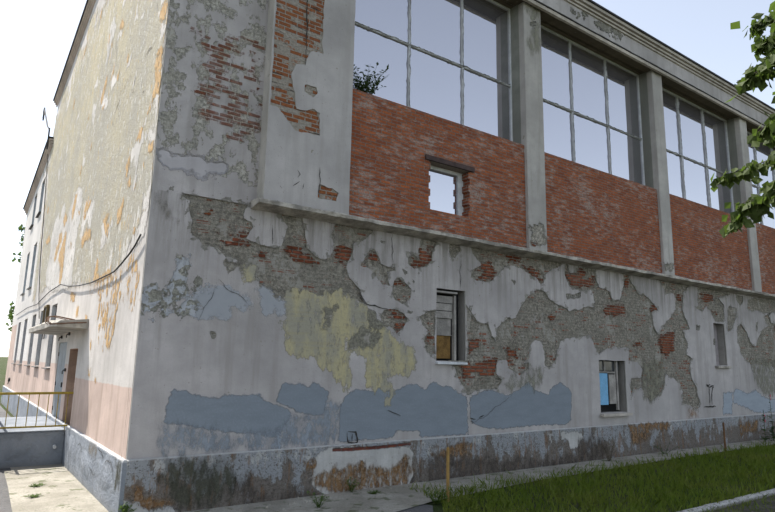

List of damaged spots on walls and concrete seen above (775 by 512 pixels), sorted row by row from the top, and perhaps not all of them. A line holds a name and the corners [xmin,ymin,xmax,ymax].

peeling [32,0,775,410]
water stain [410,434,608,483]
water stain [159,459,265,508]